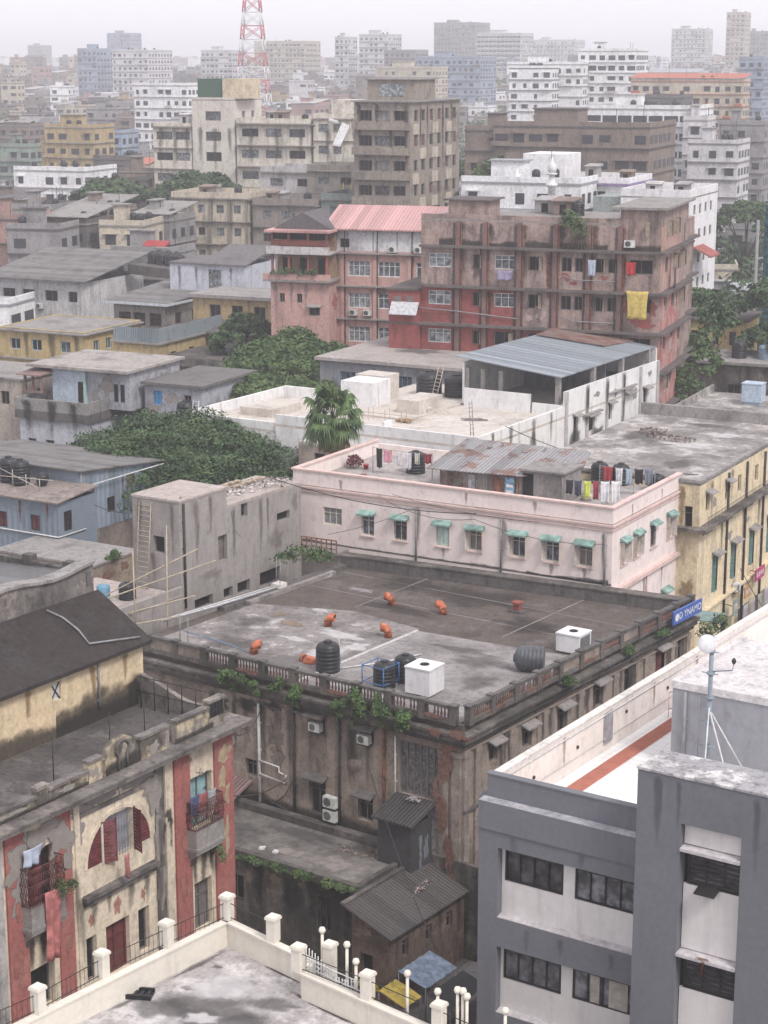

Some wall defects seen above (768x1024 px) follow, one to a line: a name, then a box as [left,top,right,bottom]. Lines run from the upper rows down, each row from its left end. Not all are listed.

water stain [439,223,608,250]
water stain [224,697,280,712]
peeling [218,742,232,856]
water stain [240,791,323,820]
water stain [336,818,378,837]
flaking render [4,770,167,923]